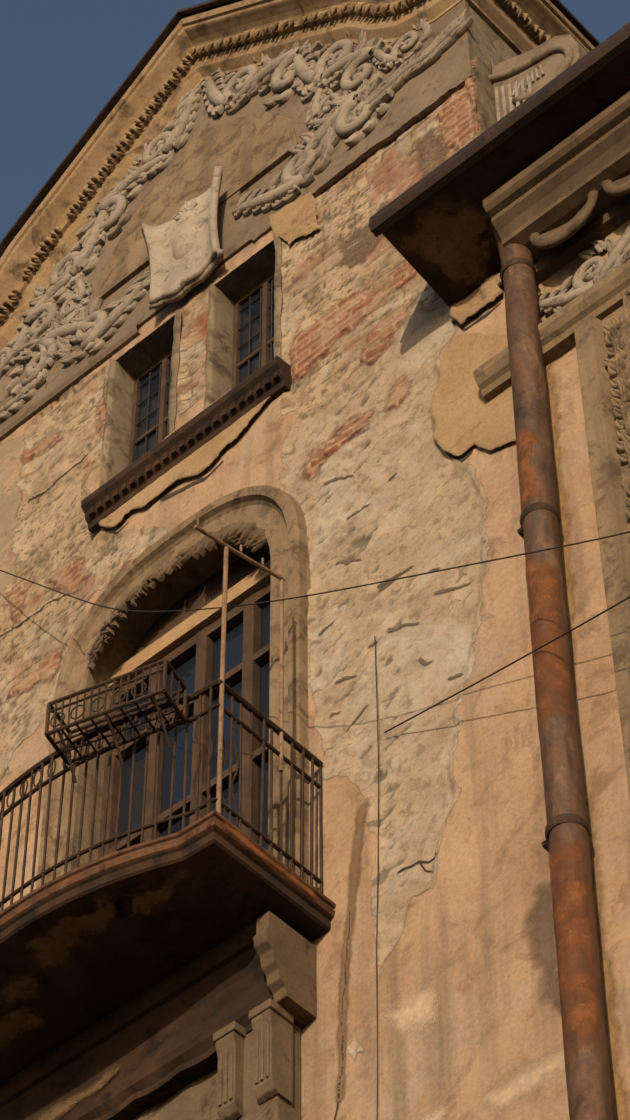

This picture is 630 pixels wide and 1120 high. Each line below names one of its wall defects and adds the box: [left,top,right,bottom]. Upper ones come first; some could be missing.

flaking render [0,59,516,966]
corrosion [516,363,576,733]
crack [334,803,367,1120]
crack [398,853,436,873]
corrosion [548,800,629,1120]